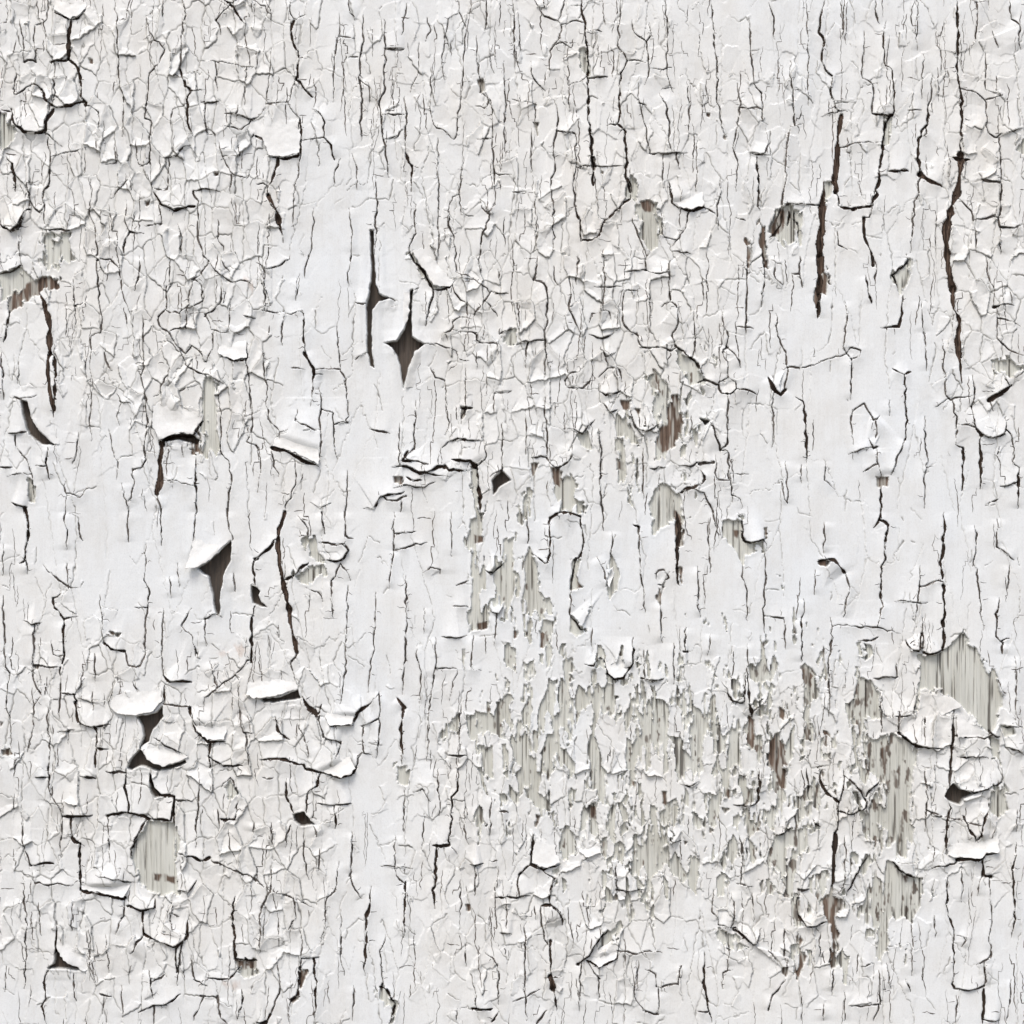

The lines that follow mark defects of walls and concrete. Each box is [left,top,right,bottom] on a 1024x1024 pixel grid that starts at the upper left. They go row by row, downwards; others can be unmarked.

peeling [0,267,33,302]
peeling [406,252,437,289]
peeling [615,347,706,507]
crack [0,0,382,1024]
crack [331,0,1024,1024]
peeling [440,463,933,965]
peeling [914,631,1016,766]
peeling [131,820,181,896]
peeling [988,784,1010,817]
peeling [789,943,850,986]